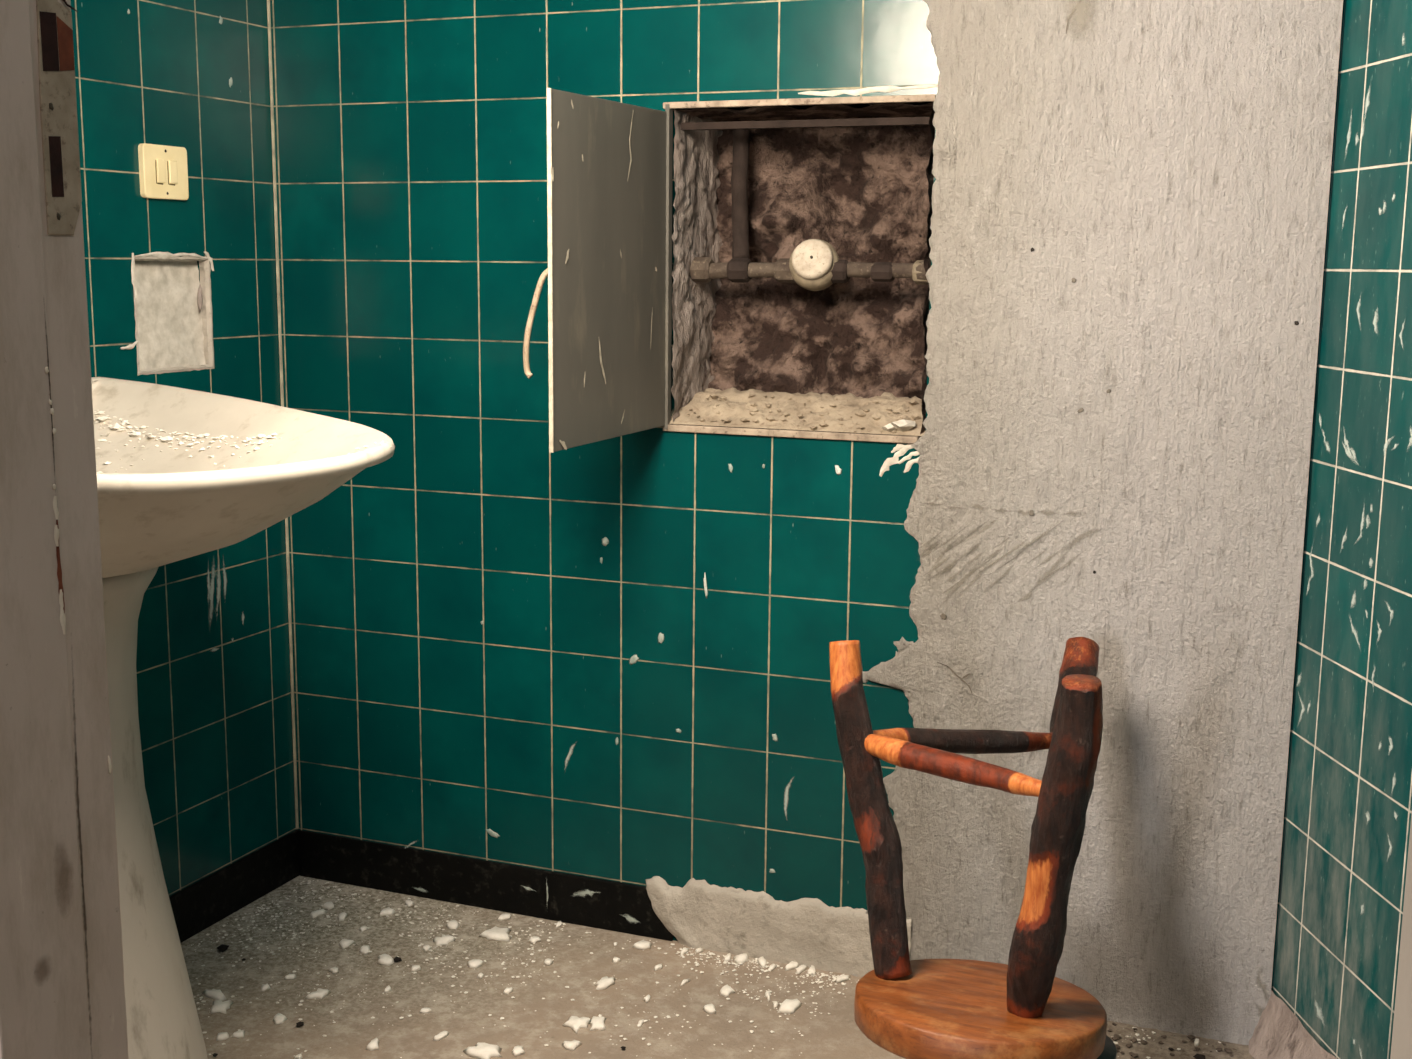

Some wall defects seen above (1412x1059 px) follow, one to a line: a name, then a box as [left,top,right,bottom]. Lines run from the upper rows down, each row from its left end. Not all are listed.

spalling [924,503,1091,601]